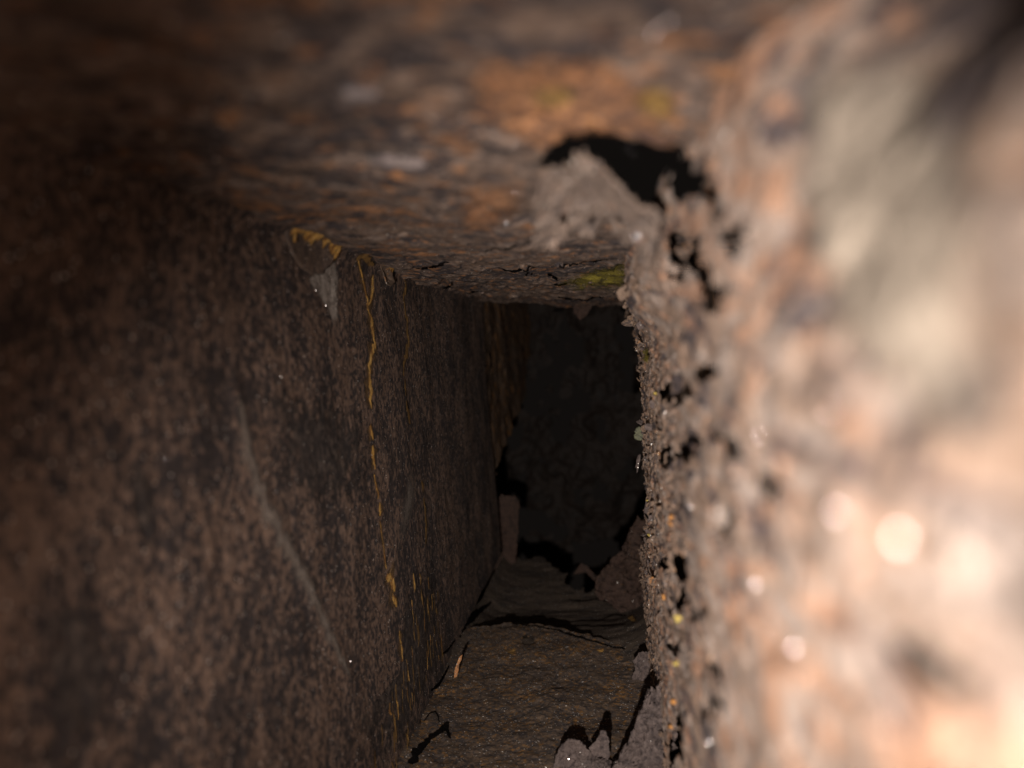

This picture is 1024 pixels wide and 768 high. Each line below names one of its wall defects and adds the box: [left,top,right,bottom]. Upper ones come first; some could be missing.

corrosion [290,228,341,260]
crack [416,262,478,294]
crack [485,241,611,301]
corrosion [356,254,378,409]
corrosion [367,424,398,609]